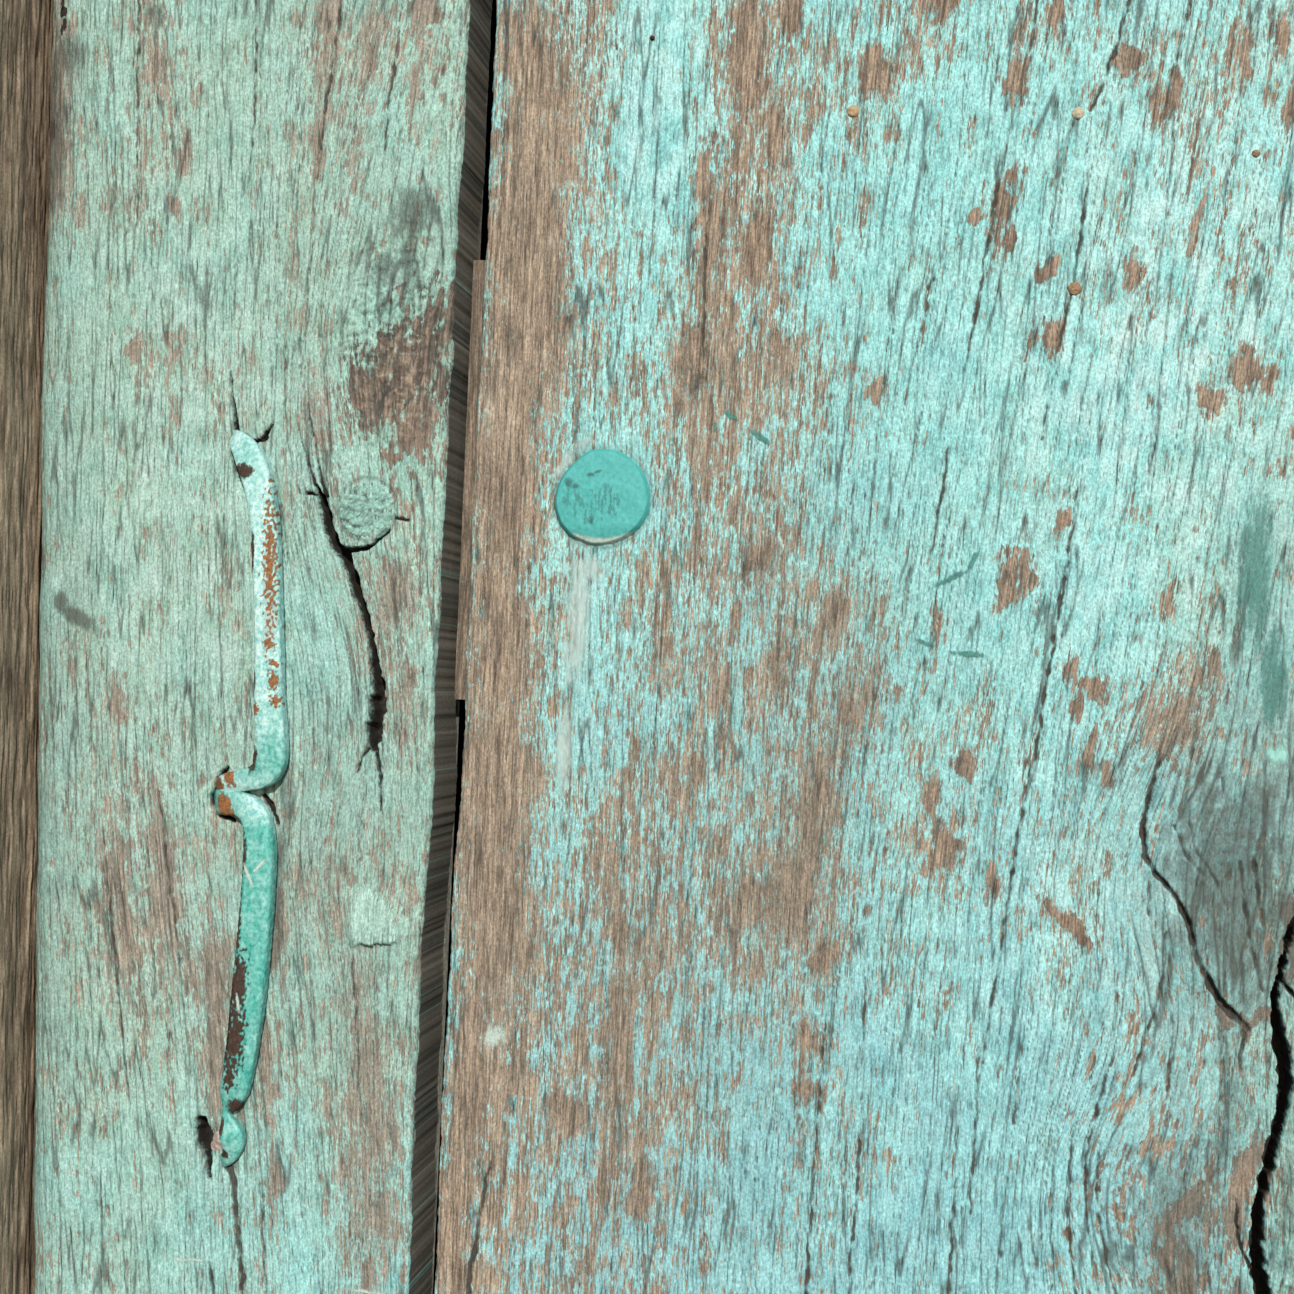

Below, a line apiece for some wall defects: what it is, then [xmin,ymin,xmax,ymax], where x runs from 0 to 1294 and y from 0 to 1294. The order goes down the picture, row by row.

peeling [967,153,1028,266]
peeling [278,269,456,523]
peeling [86,756,244,1158]
rust [216,771,250,1094]
rust [253,478,285,715]
crack [231,358,410,811]
peeling [436,0,622,1294]
peeling [731,574,906,1115]
peeling [918,744,1005,907]
peeling [991,528,1040,614]
peeling [1062,643,1234,801]
crack [1050,759,1294,1294]